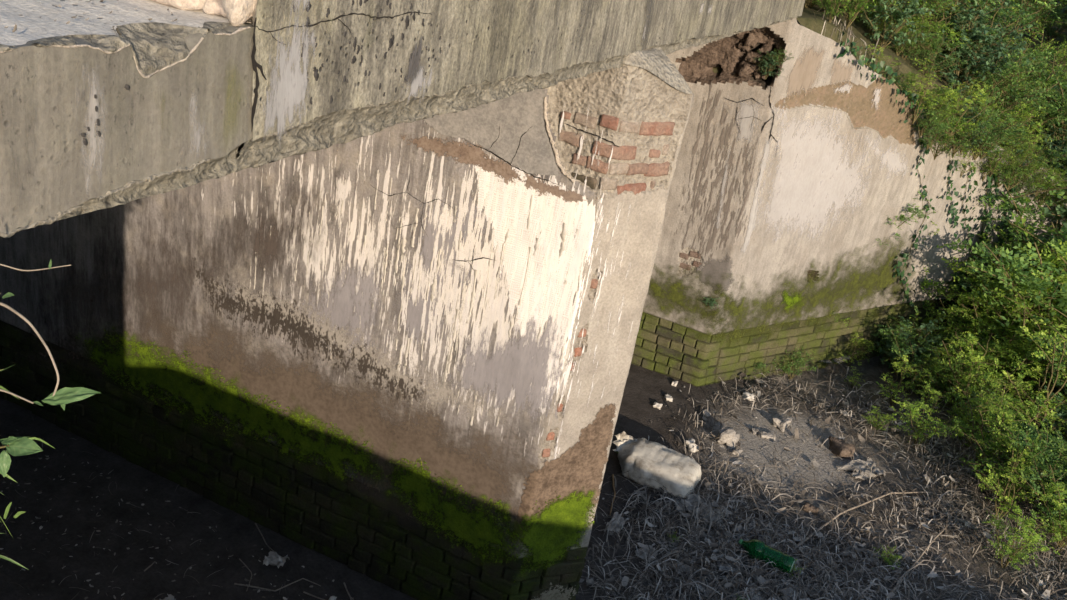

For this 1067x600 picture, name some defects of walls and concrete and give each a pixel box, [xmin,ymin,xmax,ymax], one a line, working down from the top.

leakage [83,82,101,164]
crack [251,0,432,129]
crack [466,126,561,186]
peeling [775,76,916,145]
spalling [0,1,798,463]
leakage [33,193,617,554]